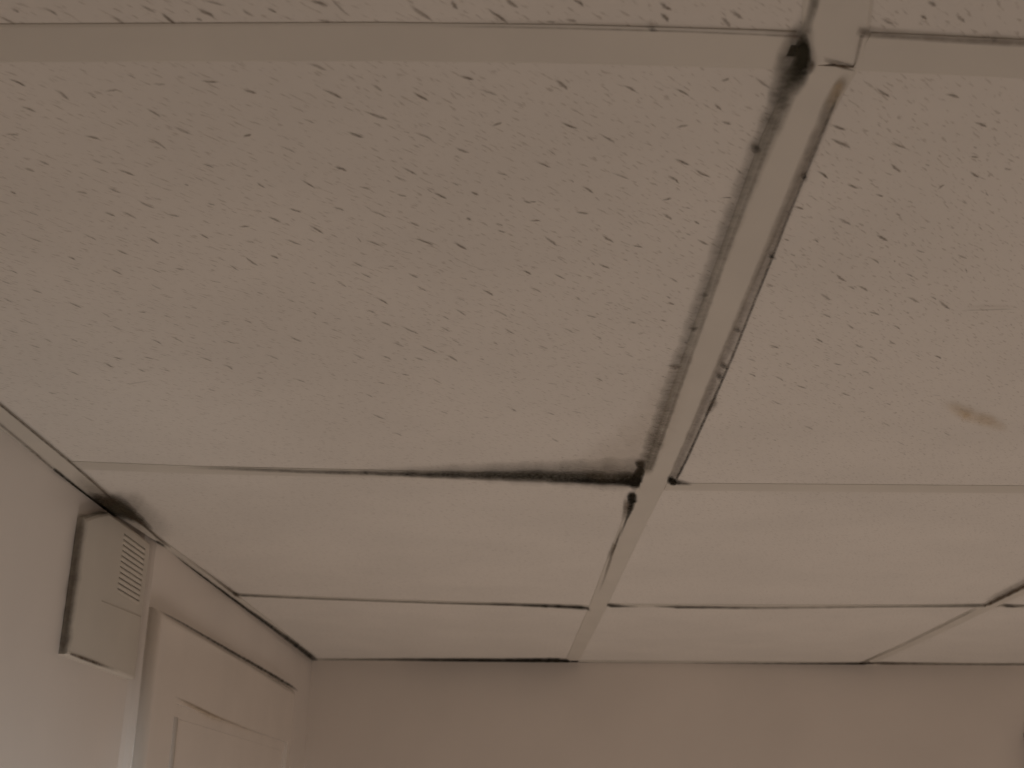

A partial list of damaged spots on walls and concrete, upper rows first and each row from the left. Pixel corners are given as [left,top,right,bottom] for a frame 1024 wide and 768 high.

leakage [774,35,813,89]
leakage [95,498,145,524]
leakage [363,456,651,521]